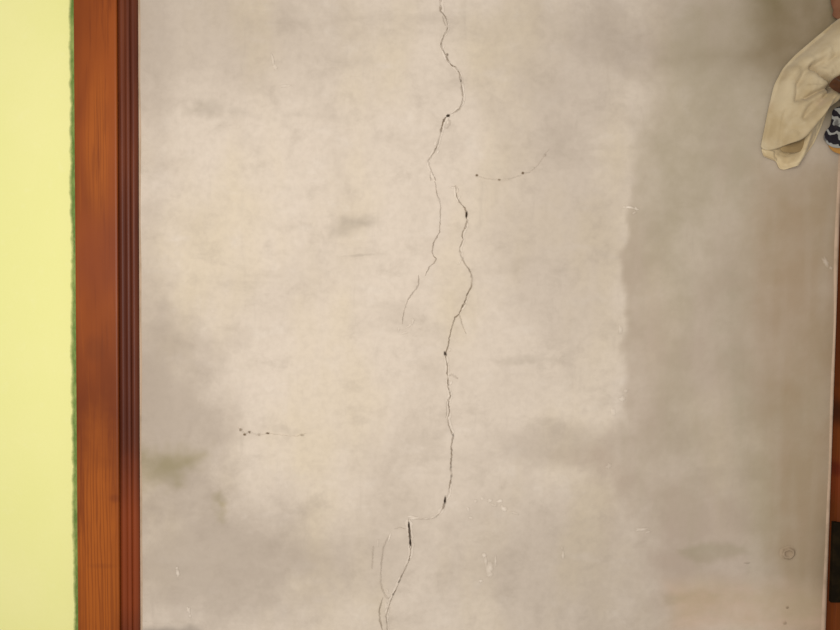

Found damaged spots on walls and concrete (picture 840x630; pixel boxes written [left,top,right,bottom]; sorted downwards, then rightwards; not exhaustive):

crack [475,154,546,181]
crack [371,0,473,630]
damp [141,433,220,499]